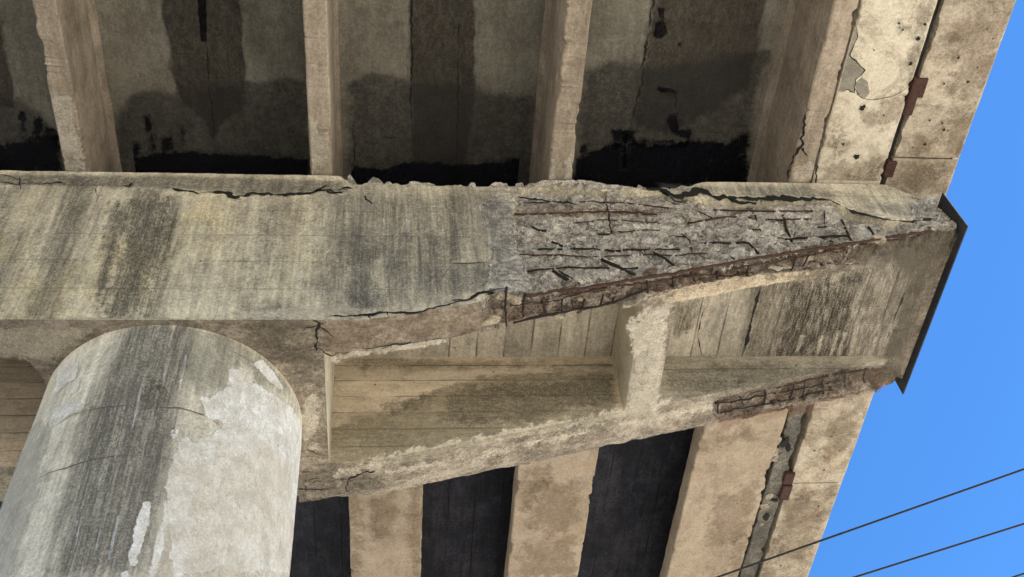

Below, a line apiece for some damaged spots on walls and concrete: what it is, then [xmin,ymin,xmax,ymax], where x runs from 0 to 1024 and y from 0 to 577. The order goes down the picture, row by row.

leakage [349,0,533,186]
leakage [579,0,769,187]
peeling [839,29,869,111]
crack [164,185,373,204]
spalling [316,175,436,186]
crack [642,114,941,223]
leakage [0,0,344,576]
crack [305,287,510,357]
spalling [468,154,957,422]
crack [68,405,221,426]
peeling [121,360,388,577]
leakage [330,373,713,476]